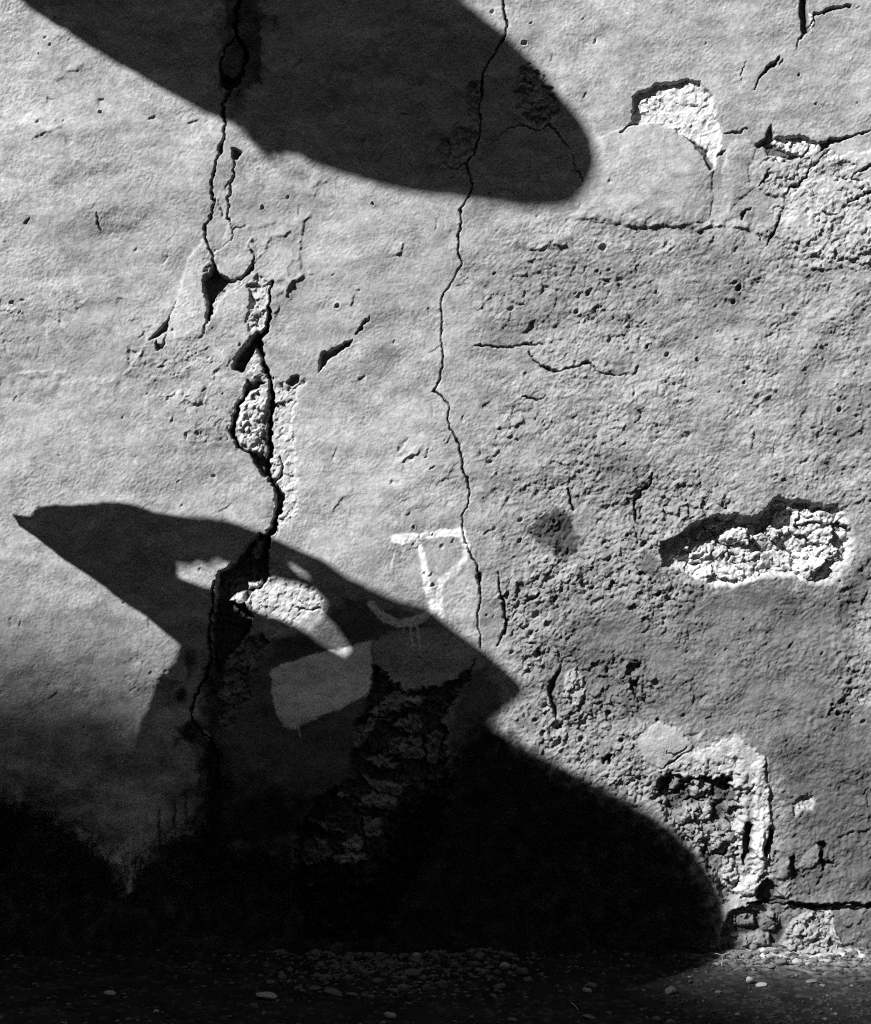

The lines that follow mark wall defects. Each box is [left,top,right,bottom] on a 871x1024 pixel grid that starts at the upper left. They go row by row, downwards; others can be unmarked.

crack [741,0,851,90]
flaking render [619,79,748,171]
flaking render [755,126,819,163]
crack [202,7,285,537]
crack [433,0,541,649]
crack [474,342,616,376]
spalling [189,375,326,796]
spalling [659,495,857,589]
crack [625,662,641,697]
crack [603,754,612,765]
flaking render [637,720,833,905]